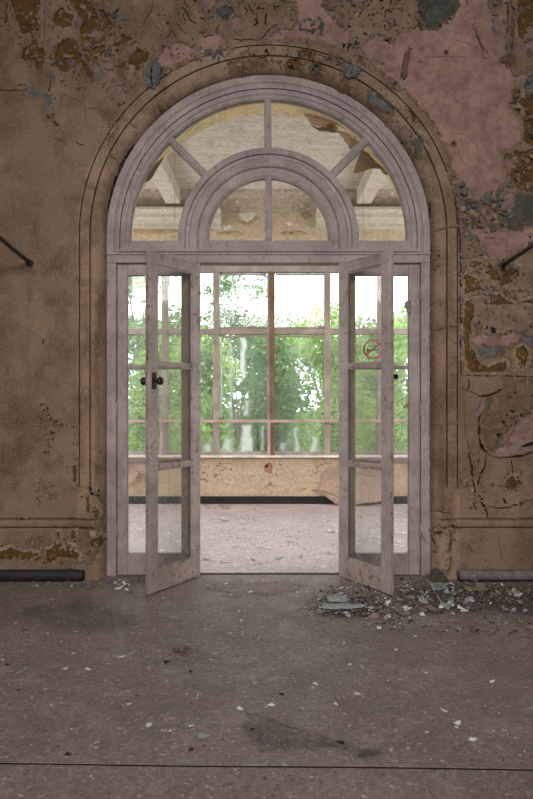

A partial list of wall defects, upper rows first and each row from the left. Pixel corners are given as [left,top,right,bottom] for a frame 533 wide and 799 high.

peeling [0,0,533,496]
crack [461,371,533,392]
peeling [0,458,108,571]
crack [468,451,533,518]